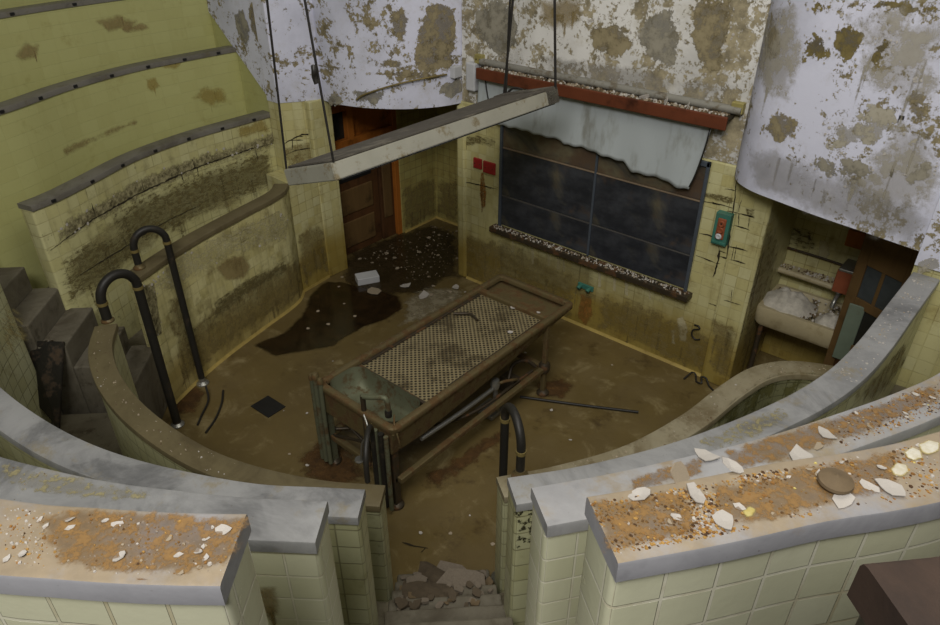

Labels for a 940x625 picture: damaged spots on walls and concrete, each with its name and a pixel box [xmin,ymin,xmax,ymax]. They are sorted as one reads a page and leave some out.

damp [101,17,146,31]
peeling [326,0,462,108]
peeling [583,0,735,80]
peeling [799,0,940,68]
peeling [761,108,802,143]
peeling [810,77,930,188]
crack [75,206,198,278]
damp [64,155,269,302]
crack [51,134,310,250]
crack [696,181,754,276]
peeling [904,161,938,185]